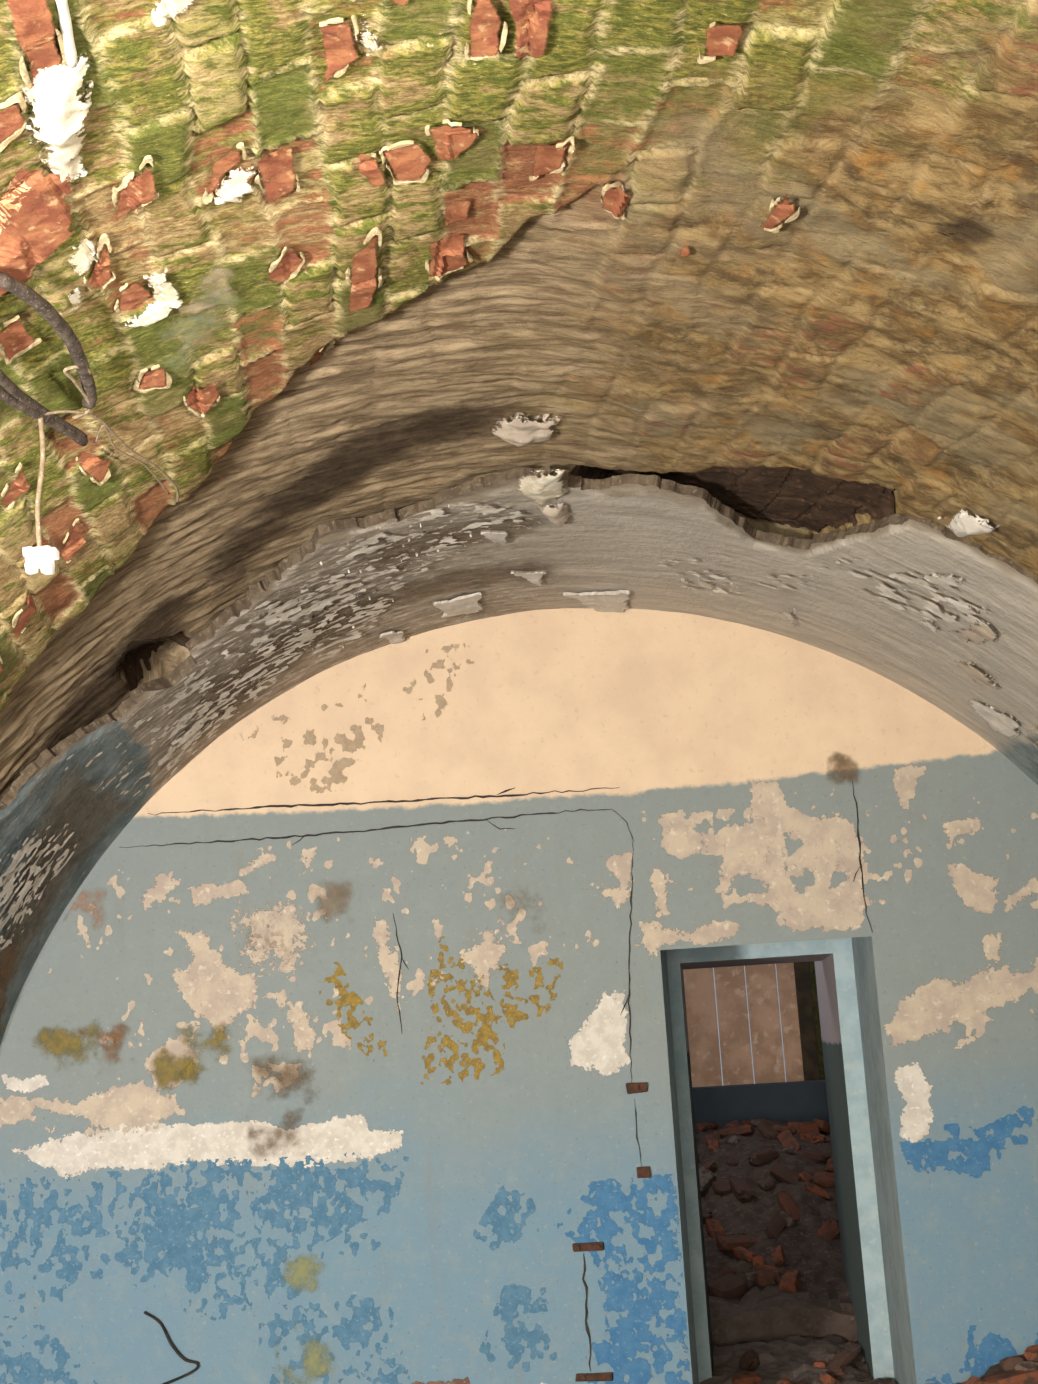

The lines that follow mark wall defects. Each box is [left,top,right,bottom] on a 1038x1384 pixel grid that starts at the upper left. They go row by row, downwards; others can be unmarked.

spalling [0,0,67,152]
spalling [352,119,479,186]
spalling [0,169,74,297]
spalling [570,465,895,533]
flaking render [65,503,540,796]
peeling [0,819,82,950]
peeling [590,765,927,961]
peeling [568,990,631,1077]
peeling [0,929,470,1384]
peeling [894,1062,1038,1178]
crack [582,1253,591,1372]
peeling [557,1174,690,1384]